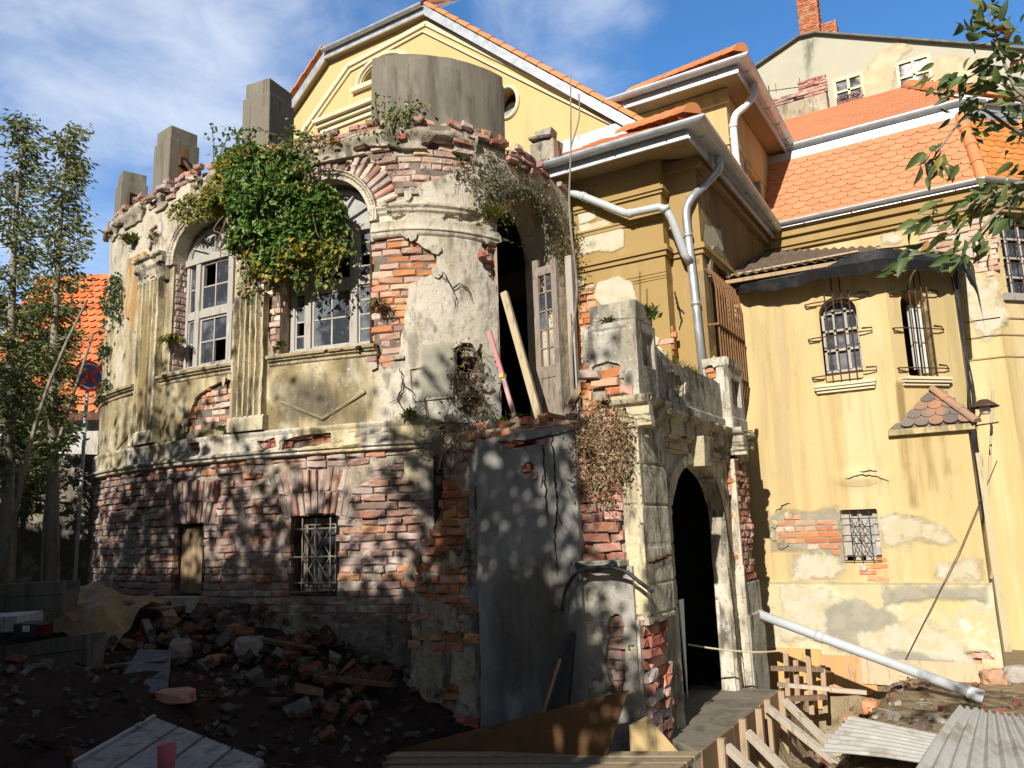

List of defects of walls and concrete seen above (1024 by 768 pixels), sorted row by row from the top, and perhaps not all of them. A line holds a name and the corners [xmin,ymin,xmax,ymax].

flaking render [856,42,912,97]
flaking render [365,230,442,370]
crack [438,273,472,309]
flaking render [181,374,231,456]
crack [498,428,579,576]
flaking render [454,456,481,729]
flaking render [769,509,845,581]
peeling [859,515,953,582]
peeling [937,558,981,583]
flaking render [964,647,996,664]